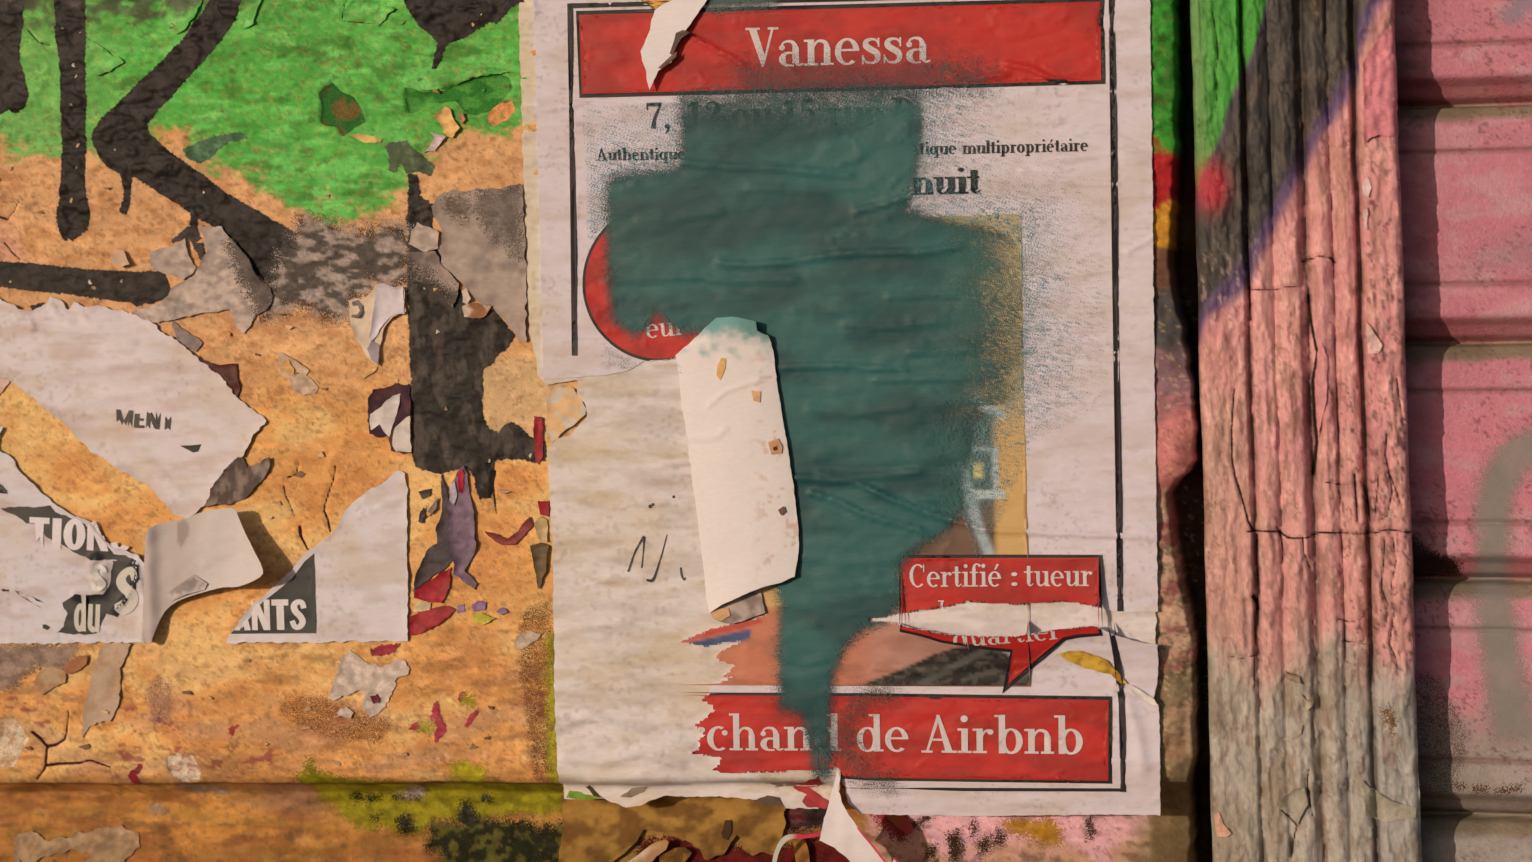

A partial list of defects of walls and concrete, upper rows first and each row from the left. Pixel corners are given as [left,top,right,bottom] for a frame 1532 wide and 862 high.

spalling [319,83,383,143]
spalling [404,66,515,153]
peeling [172,320,241,398]
peeling [278,352,319,395]
crack [1212,0,1411,688]
peeling [529,416,544,465]
crack [283,463,336,550]
crack [31,710,110,780]
peeling [13,825,141,862]